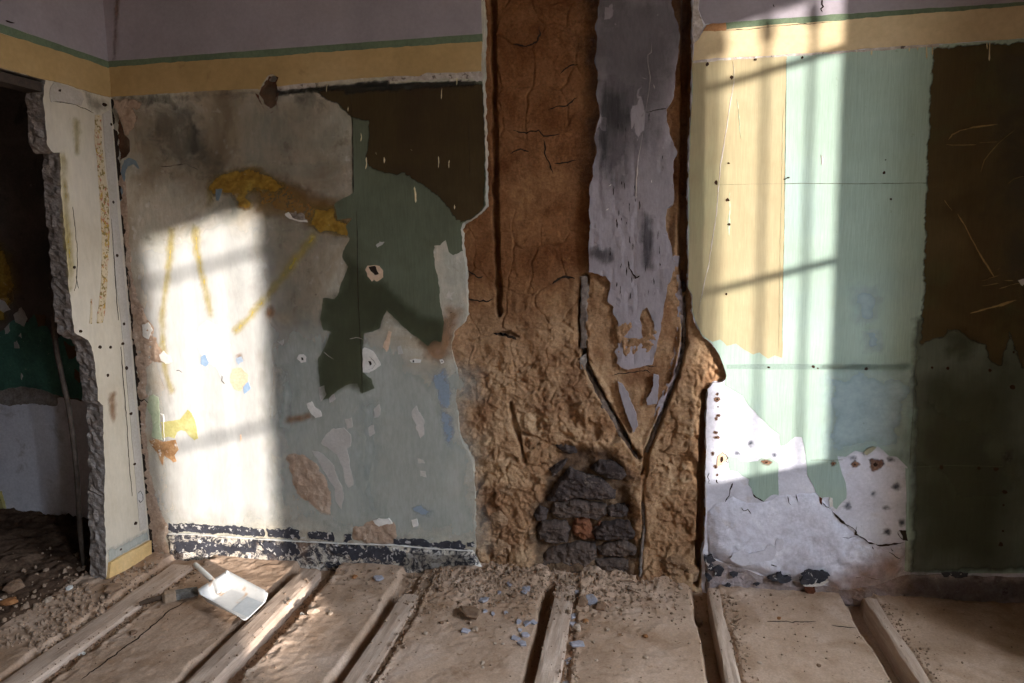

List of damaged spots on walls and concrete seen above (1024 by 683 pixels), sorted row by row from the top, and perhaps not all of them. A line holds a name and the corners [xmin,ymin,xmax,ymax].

flaking render [692,0,704,44]
flaking render [256,72,483,113]
flaking render [113,98,475,569]
flaking render [654,255,683,425]
flaking render [580,276,638,459]
flaking render [717,452,728,466]
crack [823,503,901,551]
peeling [803,579,829,594]